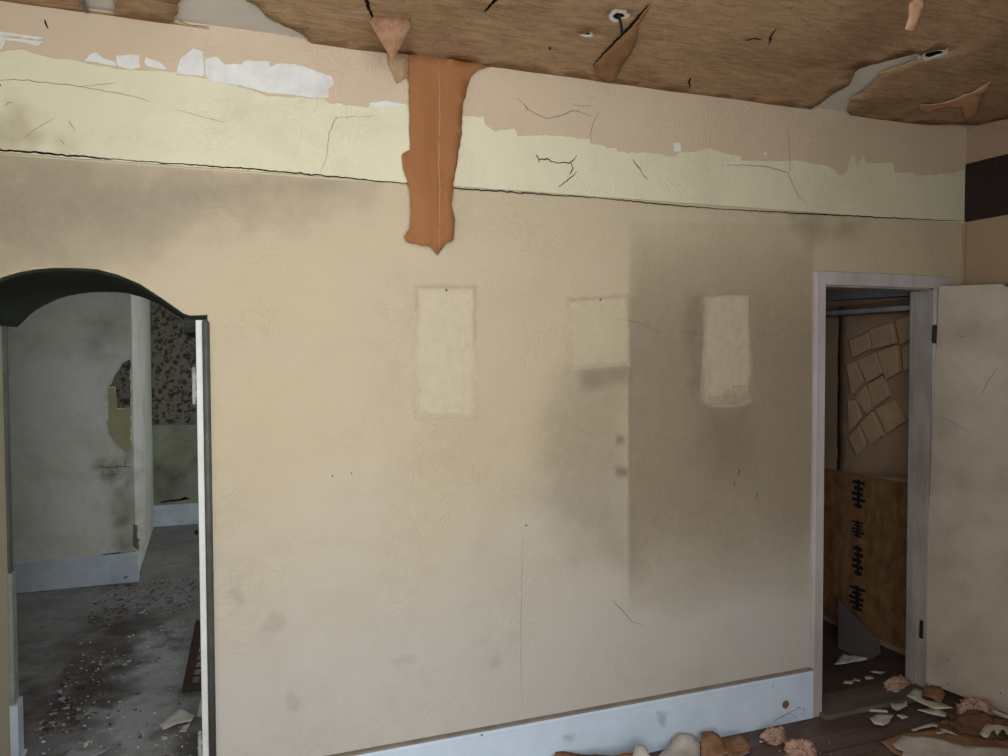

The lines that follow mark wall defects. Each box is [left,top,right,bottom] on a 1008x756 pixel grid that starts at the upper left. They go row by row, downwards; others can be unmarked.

peeling [0,1,409,108]
crack [365,0,373,18]
crack [0,116,408,184]
crack [453,99,954,221]
peeling [462,67,967,175]
peeling [106,388,131,452]